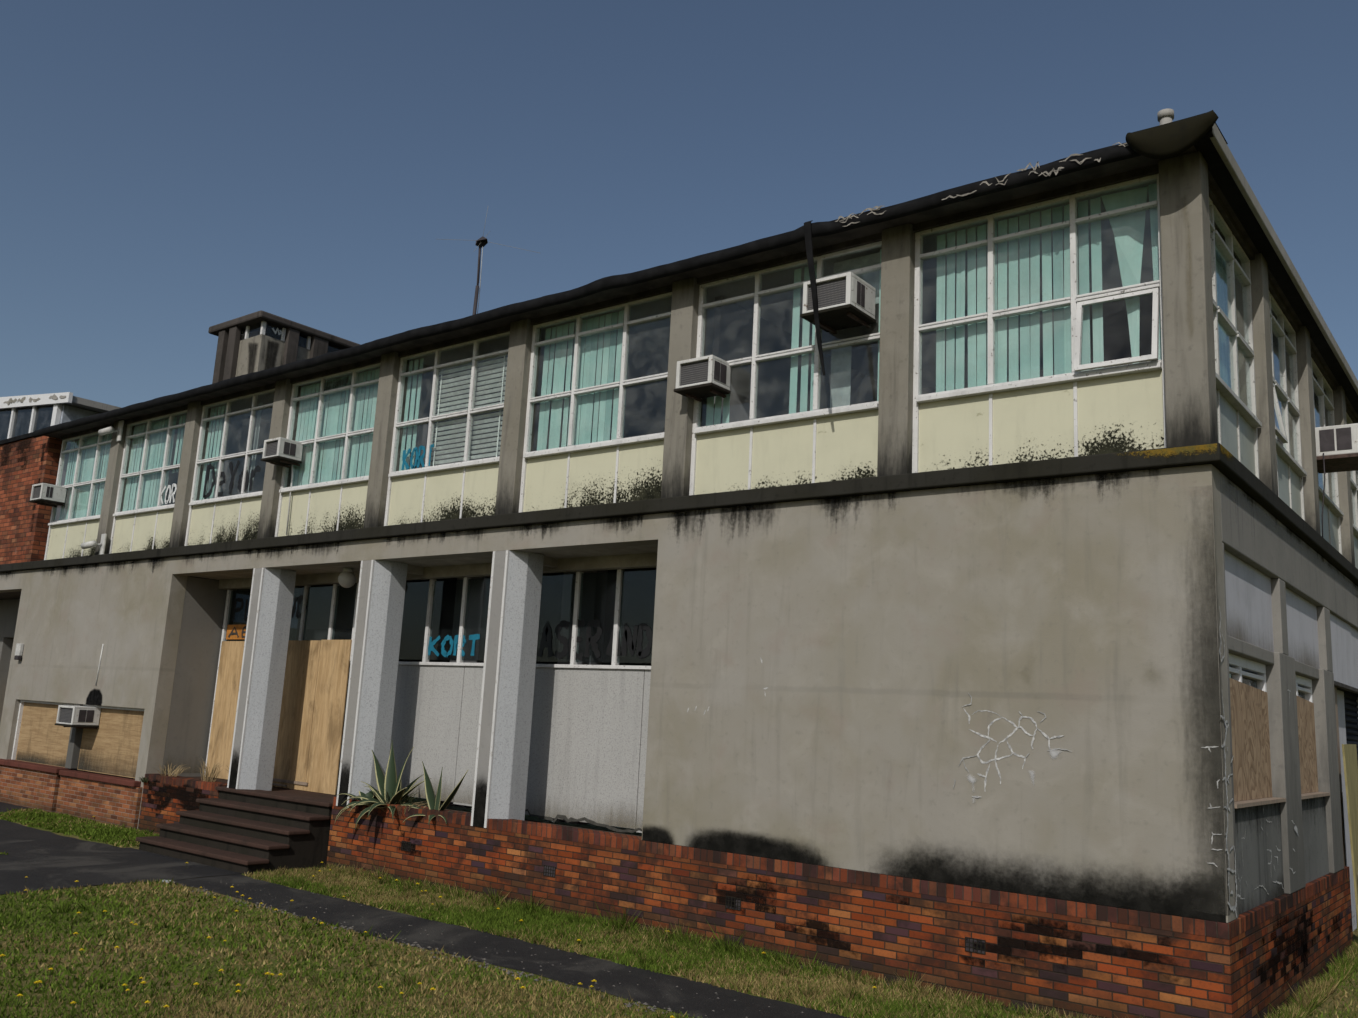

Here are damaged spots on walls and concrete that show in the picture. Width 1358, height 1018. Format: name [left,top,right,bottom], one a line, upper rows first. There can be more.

leakage [1001,472,1120,491]
leakage [819,492,895,511]
crack [953,693,1069,798]
crack [1201,696,1298,917]
leakage [642,827,673,845]
leakage [689,832,825,866]
leakage [886,853,1241,923]